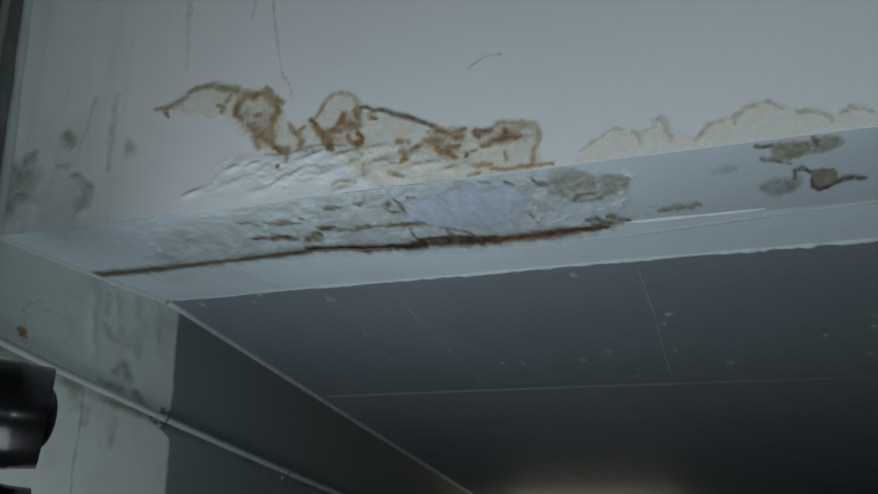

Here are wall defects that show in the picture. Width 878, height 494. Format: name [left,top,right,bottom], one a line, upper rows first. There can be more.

peeling [754,136,864,190]
peeling [37,170,701,272]